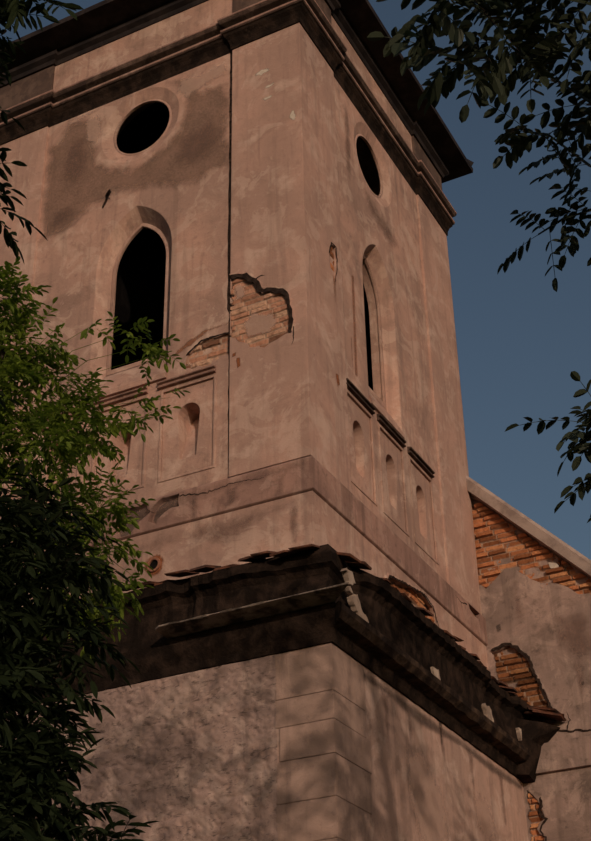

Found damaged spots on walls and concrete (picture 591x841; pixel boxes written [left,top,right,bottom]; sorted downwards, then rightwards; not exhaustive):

spalling [176,271,296,369]
spalling [471,500,591,595]
spalling [384,572,439,626]
spalling [491,643,553,708]
crack [558,711,591,733]